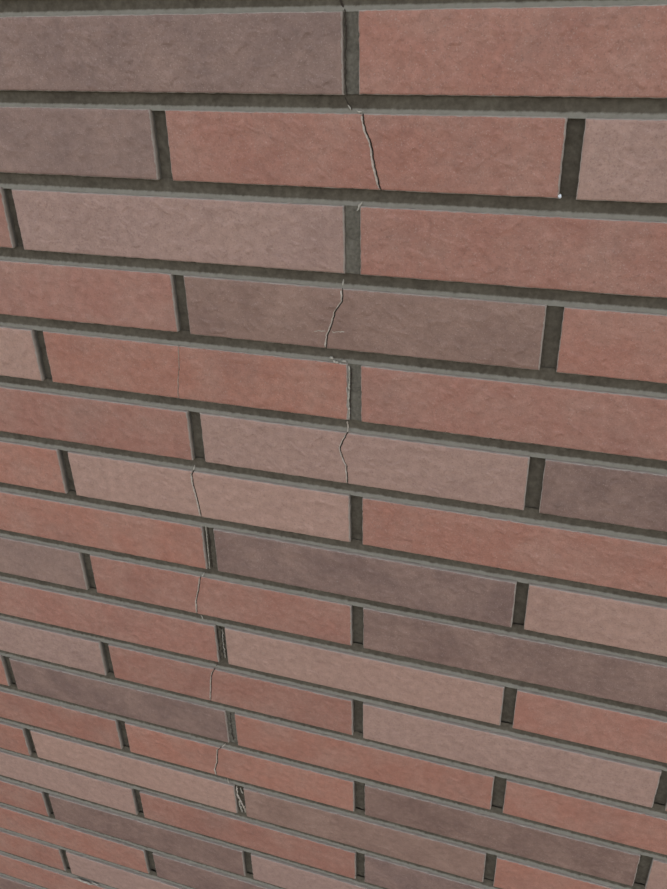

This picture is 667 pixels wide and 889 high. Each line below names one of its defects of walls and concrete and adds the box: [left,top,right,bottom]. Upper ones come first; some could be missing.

crack [324,0,381,347]
crack [339,364,362,483]
crack [190,465,238,783]